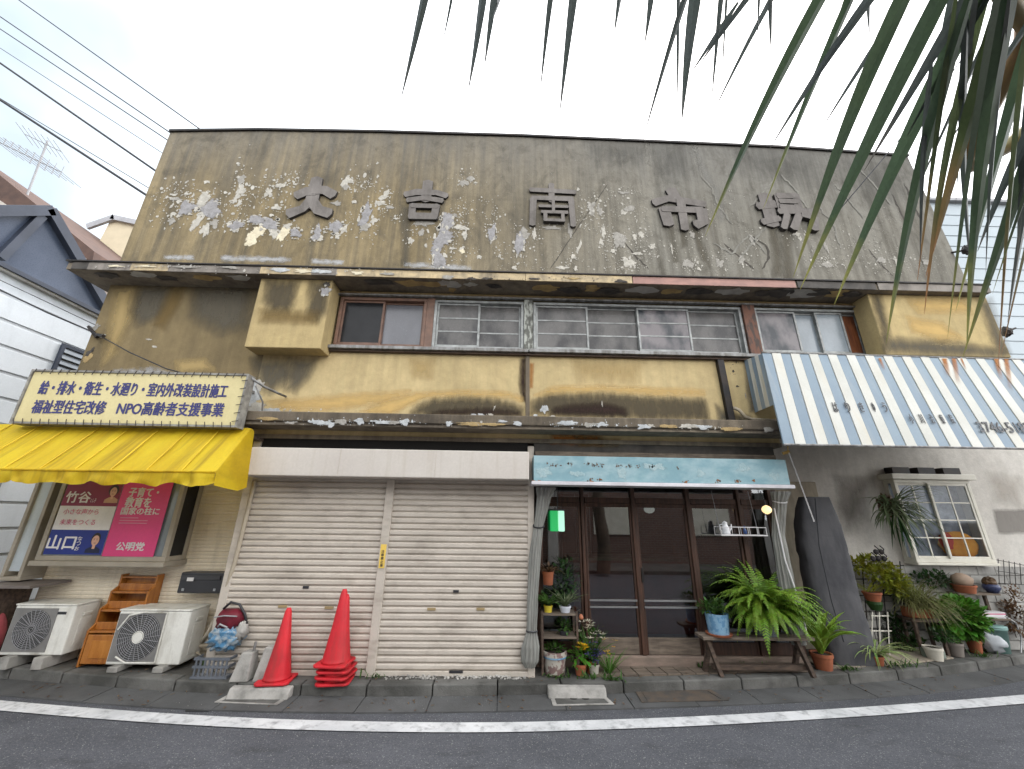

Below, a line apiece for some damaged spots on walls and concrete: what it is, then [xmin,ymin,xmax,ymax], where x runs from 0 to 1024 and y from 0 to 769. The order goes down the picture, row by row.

peeling [149,157,766,297]
water stain [107,287,182,356]
water stain [194,287,250,330]
water stain [179,360,209,371]
water stain [279,368,754,420]
peeling [446,405,522,427]
peeling [533,405,743,431]